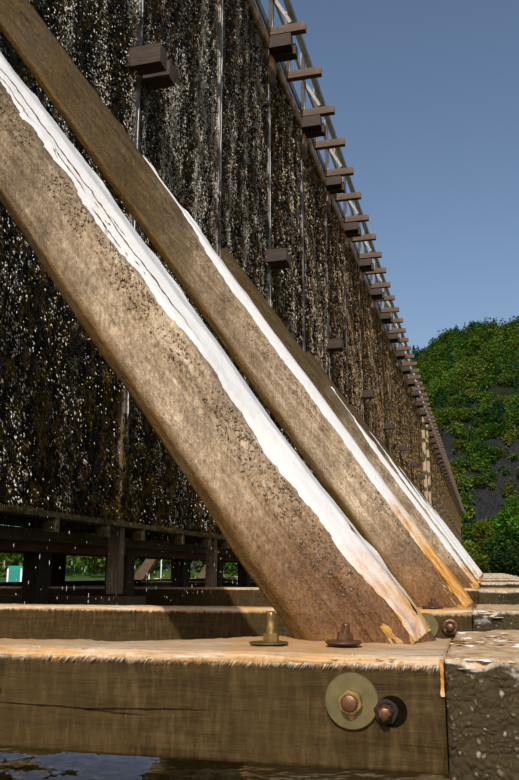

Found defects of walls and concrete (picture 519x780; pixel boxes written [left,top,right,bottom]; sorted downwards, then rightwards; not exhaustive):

corrosion [380,623,431,645]
crack [3,702,211,715]